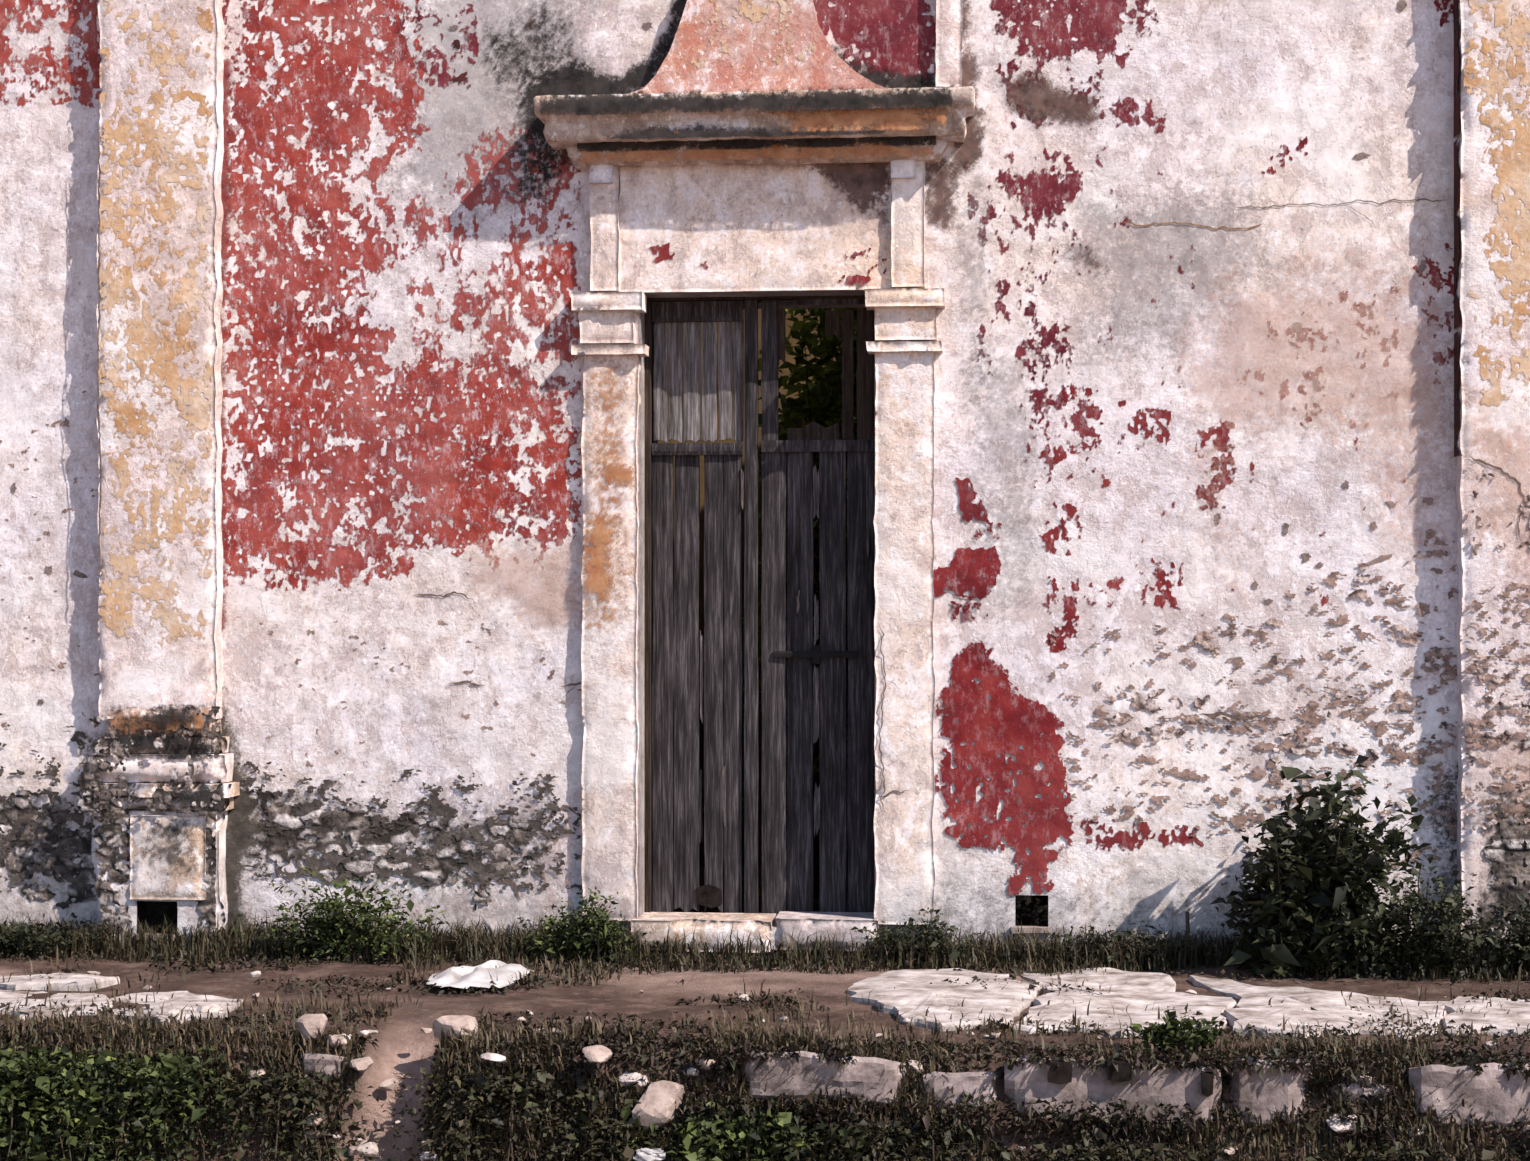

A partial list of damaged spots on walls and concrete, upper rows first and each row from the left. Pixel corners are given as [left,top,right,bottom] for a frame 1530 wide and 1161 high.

peeling [0,0,581,647]
damp [483,0,986,228]
damp [999,69,1100,127]
peeling [968,146,1171,488]
peeling [990,0,1166,133]
crack [1122,198,1443,230]
peeling [1330,0,1530,407]
peeling [1193,419,1254,525]
crack [1468,455,1529,543]
damp [85,686,228,759]
flaking render [0,706,582,948]
peeling [933,461,1530,933]